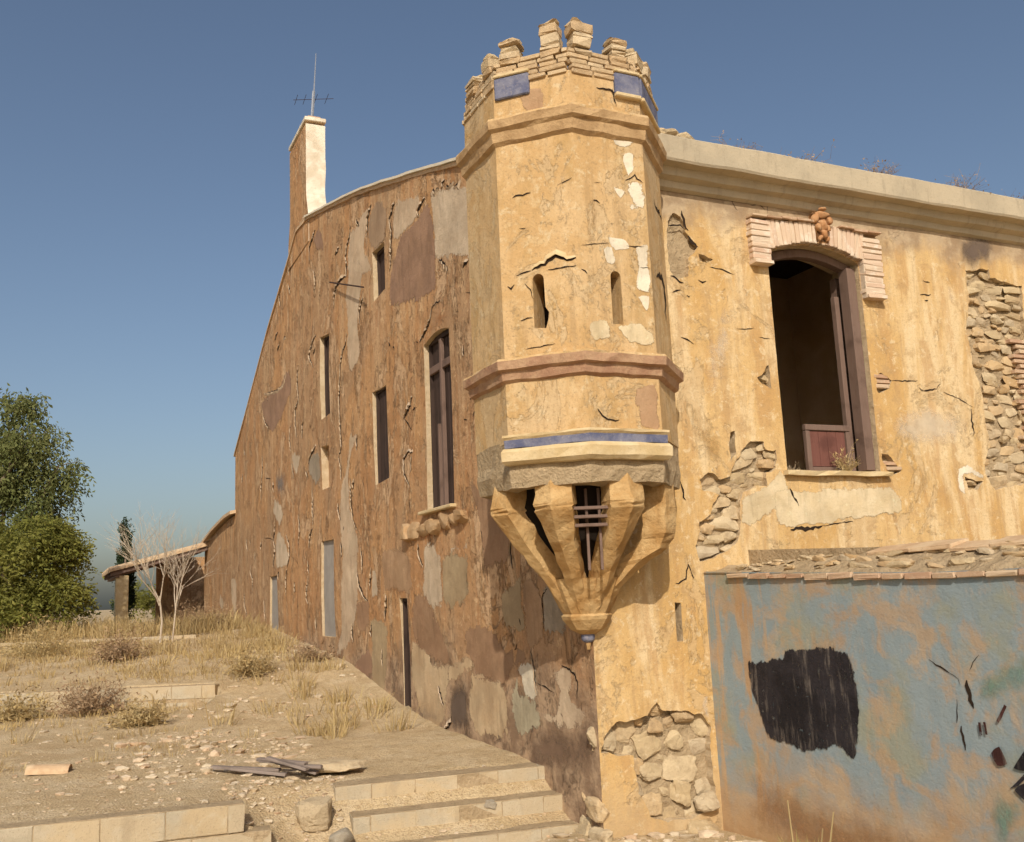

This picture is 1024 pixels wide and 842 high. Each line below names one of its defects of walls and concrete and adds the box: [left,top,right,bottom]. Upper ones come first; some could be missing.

flaking render [614,140,645,210]
crack [627,174,697,248]
crack [508,243,602,321]
flaking render [604,237,651,310]
crack [631,246,734,314]
crack [892,380,975,433]
flaking render [958,270,1024,493]
flaking render [696,442,902,561]
flaking render [337,433,359,656]
flaking render [411,579,711,820]
crack [930,656,978,750]
water stain [765,802,871,842]